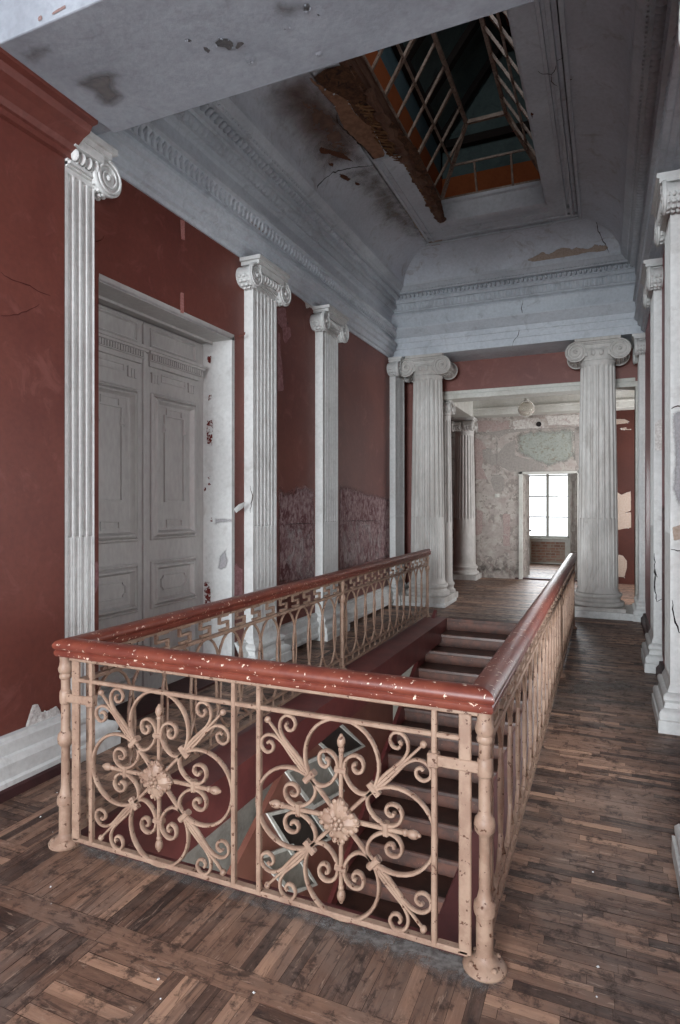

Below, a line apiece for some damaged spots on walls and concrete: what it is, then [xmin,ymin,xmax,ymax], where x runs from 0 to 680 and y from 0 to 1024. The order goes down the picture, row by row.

peeling [203,37,244,53]
damp [81,74,119,103]
flaking render [310,78,387,159]
crack [317,116,374,188]
flaking render [528,244,609,262]
peeling [474,414,580,479]
peeling [475,510,483,535]
flaking render [617,491,631,530]
flaking render [531,541,565,563]
flaking render [618,555,627,578]